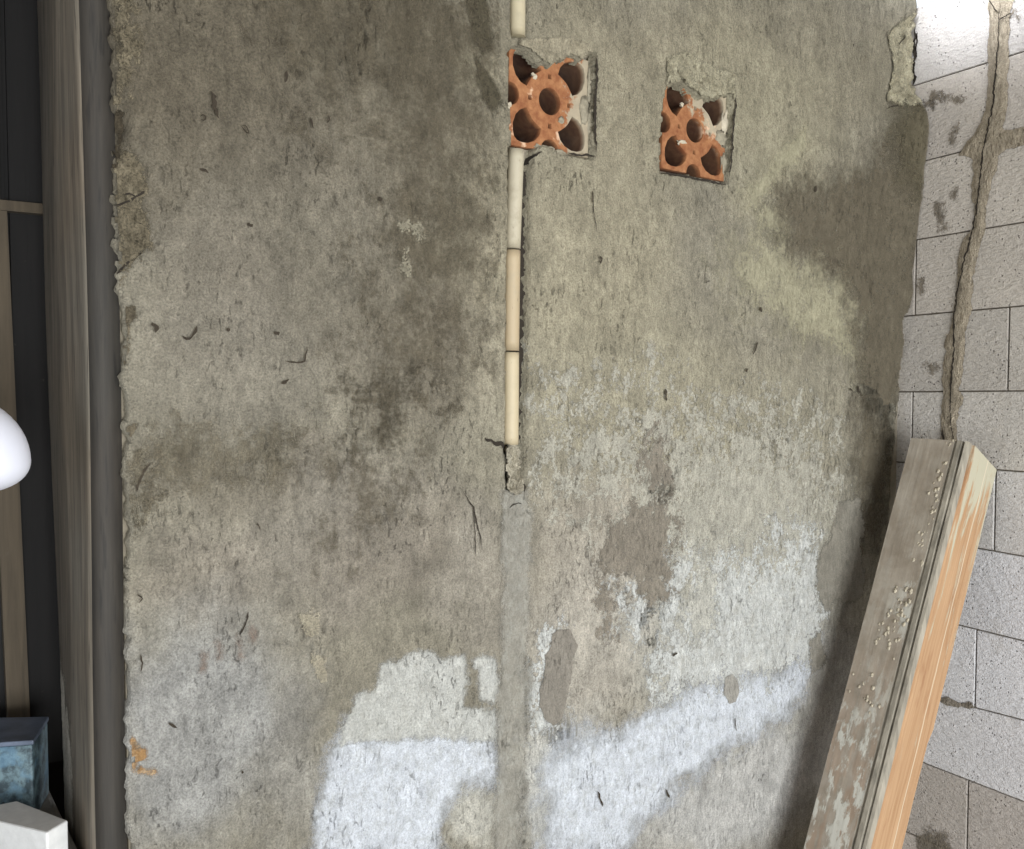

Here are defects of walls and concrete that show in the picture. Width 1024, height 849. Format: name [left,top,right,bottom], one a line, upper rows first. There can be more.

flaking render [887,10,924,107]
crack [941,0,1011,440]
damp [735,126,922,611]
corrosion [130,738,156,776]
damp [313,731,500,849]
damp [518,632,827,849]